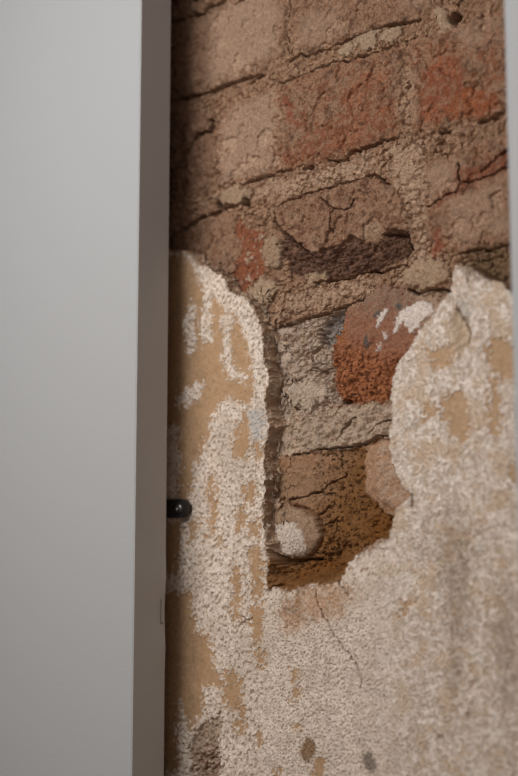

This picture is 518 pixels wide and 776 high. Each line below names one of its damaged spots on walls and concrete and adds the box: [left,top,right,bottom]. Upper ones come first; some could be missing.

flaking render [166,0,514,671]